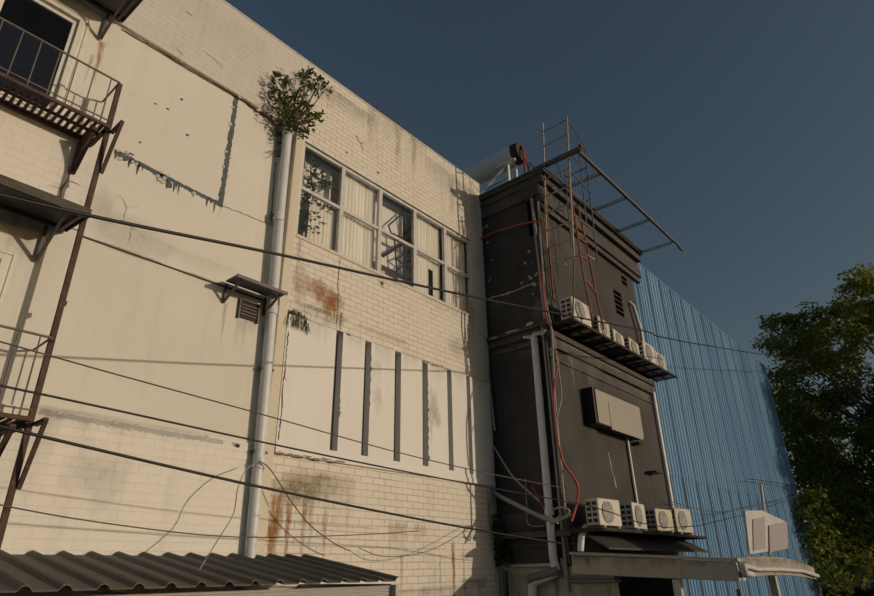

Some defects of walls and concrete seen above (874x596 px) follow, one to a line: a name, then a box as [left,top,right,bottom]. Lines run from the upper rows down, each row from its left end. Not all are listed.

peeling [114,27,283,210]
rust [314,283,342,325]
rust [268,498,290,551]